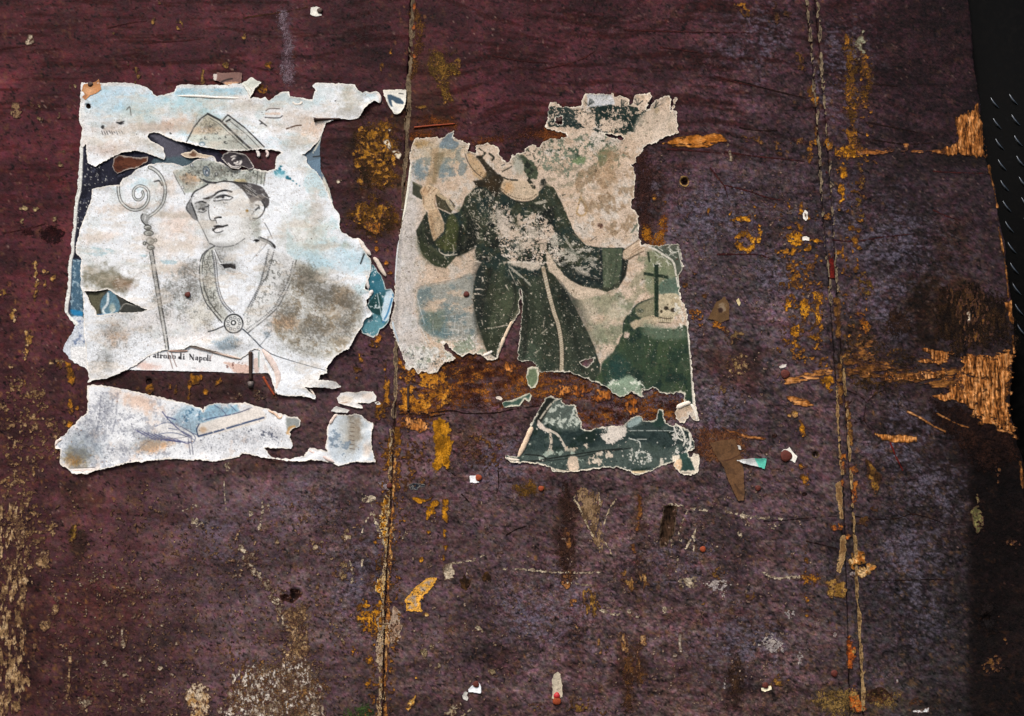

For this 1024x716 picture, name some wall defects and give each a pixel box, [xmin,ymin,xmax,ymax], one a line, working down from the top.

rust [346,9,566,240]
rust [390,354,687,433]
peeling [469,0,965,716]